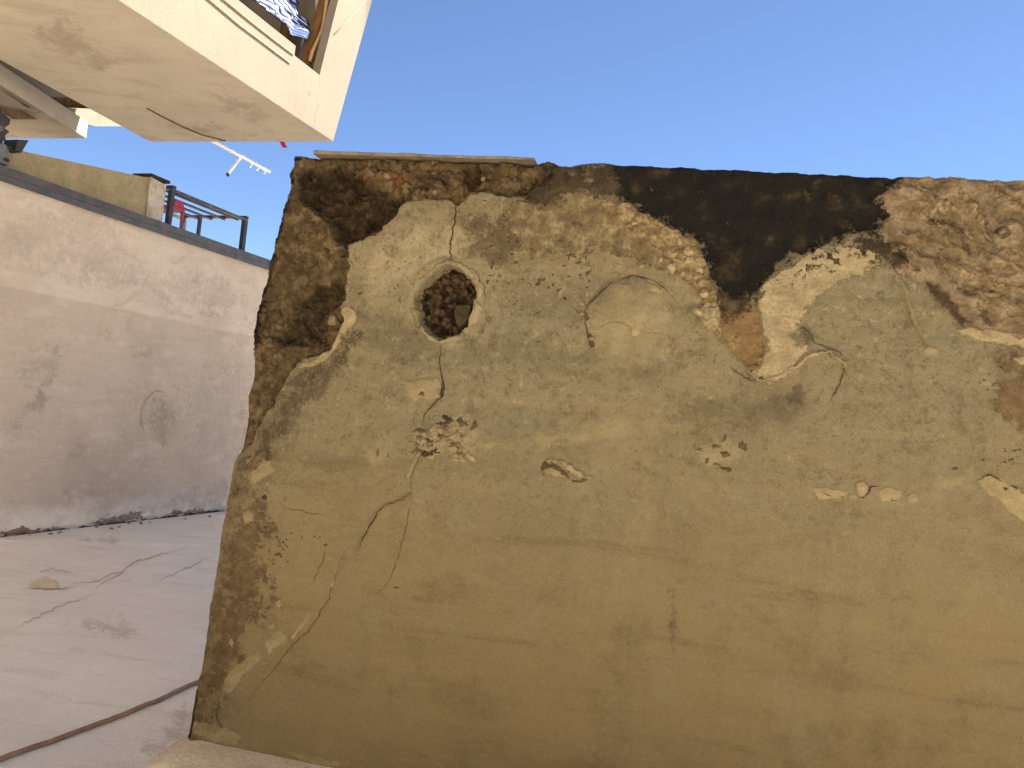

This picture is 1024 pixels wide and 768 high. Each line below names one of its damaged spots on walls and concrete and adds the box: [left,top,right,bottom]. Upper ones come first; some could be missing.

crack [411,311,445,426]
spalling [226,156,1024,524]
crack [797,324,847,402]
crack [12,550,207,630]
crack [249,453,421,699]